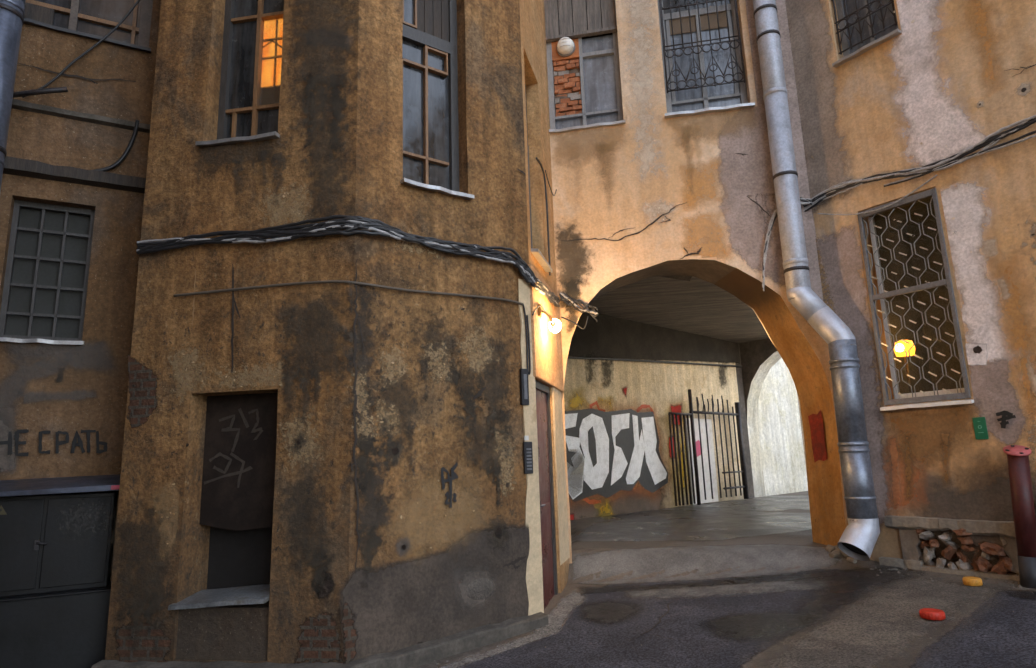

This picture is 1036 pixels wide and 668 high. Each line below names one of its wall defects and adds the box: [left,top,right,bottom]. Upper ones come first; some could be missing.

crack [568,202,687,241]
peeling [941,184,1036,395]
spalling [127,354,158,428]
leakage [452,360,511,505]
spalling [294,570,358,664]